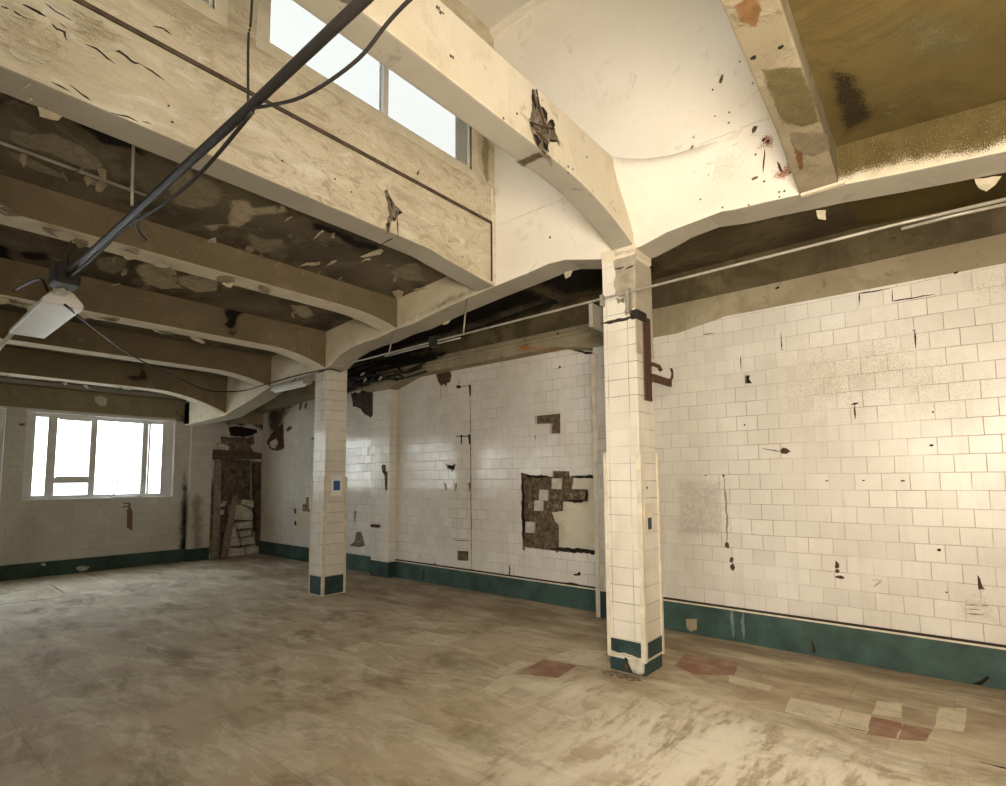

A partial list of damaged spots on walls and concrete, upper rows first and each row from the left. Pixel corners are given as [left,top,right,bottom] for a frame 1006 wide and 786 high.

crack [1,3,164,80]
peeling [5,83,108,192]
crack [52,82,91,101]
spalling [516,89,564,159]
leakage [761,62,1006,181]
peeling [166,169,291,268]
spalling [384,190,403,233]
peeling [95,248,235,295]
peeling [361,249,383,262]
peeling [537,414,560,434]
spalling [350,531,365,547]
peeling [521,471,595,555]